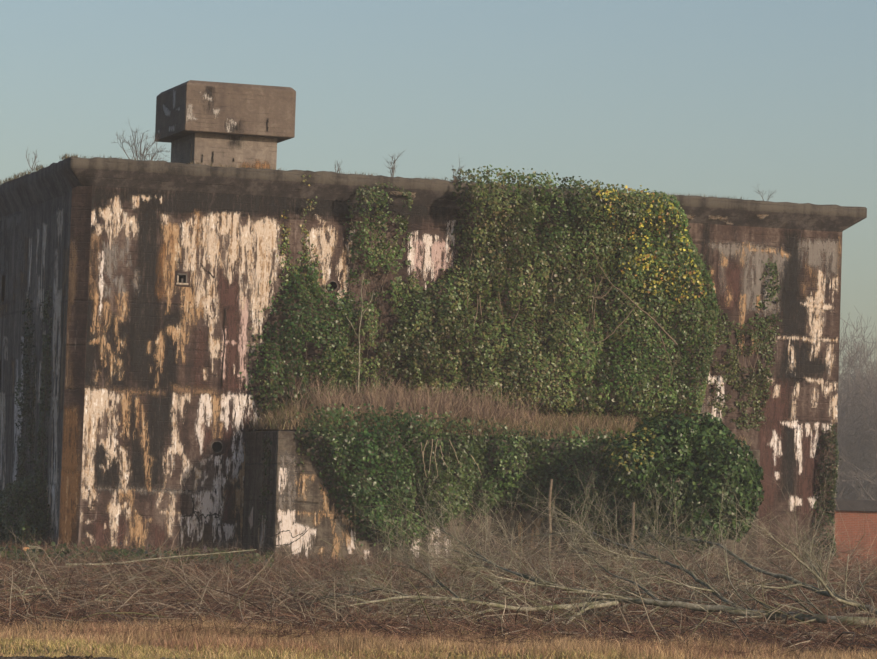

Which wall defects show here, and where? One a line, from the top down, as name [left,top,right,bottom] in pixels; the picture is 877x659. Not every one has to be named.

peeling [80,388,152,549]
peeling [91,195,162,250]
rust [59,231,253,553]
peeling [162,392,258,547]
peeling [162,211,285,380]
leakage [81,186,457,523]
peeling [276,509,316,558]
peeling [305,216,355,323]
peeling [407,220,455,290]
peeling [708,373,725,419]
leakage [700,223,840,511]
peeling [775,269,838,360]